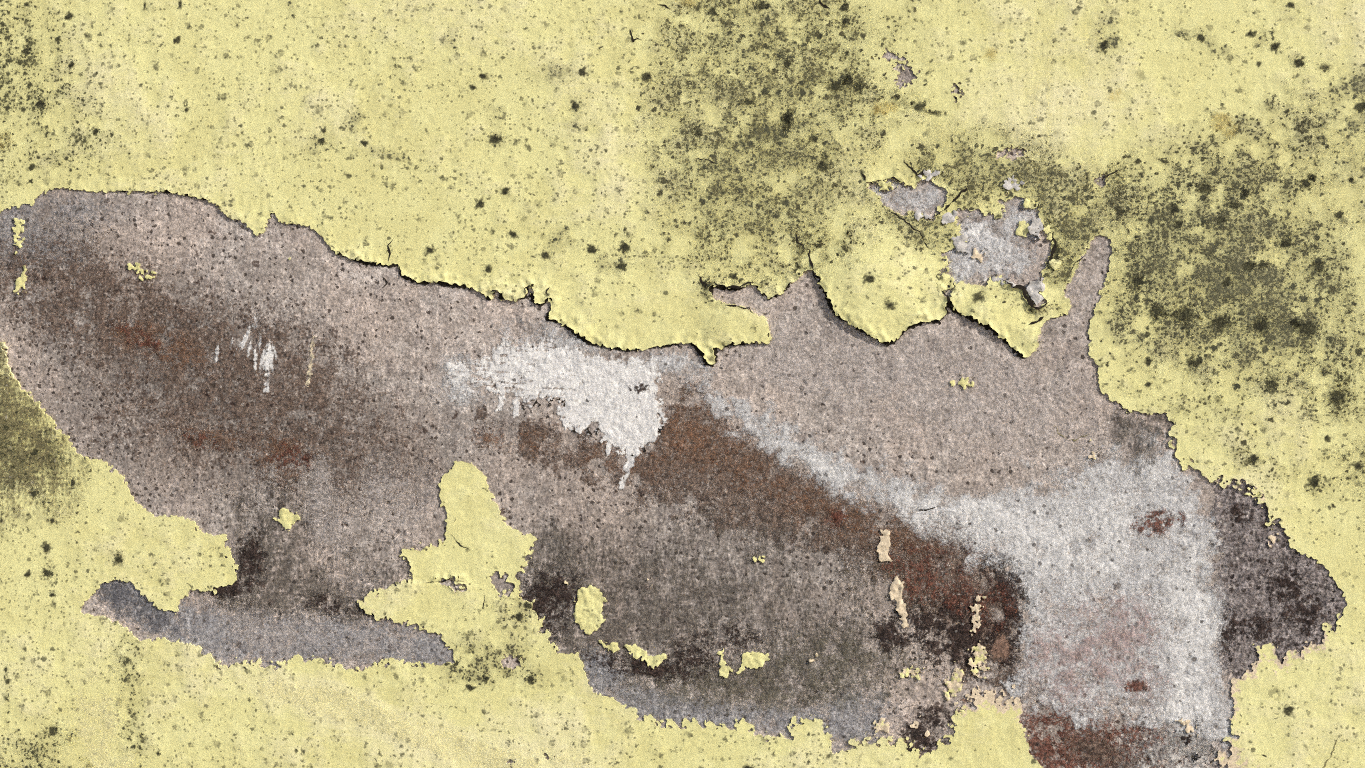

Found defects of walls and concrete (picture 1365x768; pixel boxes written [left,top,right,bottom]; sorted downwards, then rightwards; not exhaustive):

leakage [0,198,97,266]
leakage [0,0,114,185]
leakage [636,0,1365,428]
peeling [991,145,1033,161]
leakage [24,541,58,597]
leakage [0,343,92,529]
peeling [0,170,1347,768]
leakage [96,316,1298,768]
rust [471,381,1185,768]
leakage [1304,447,1365,508]